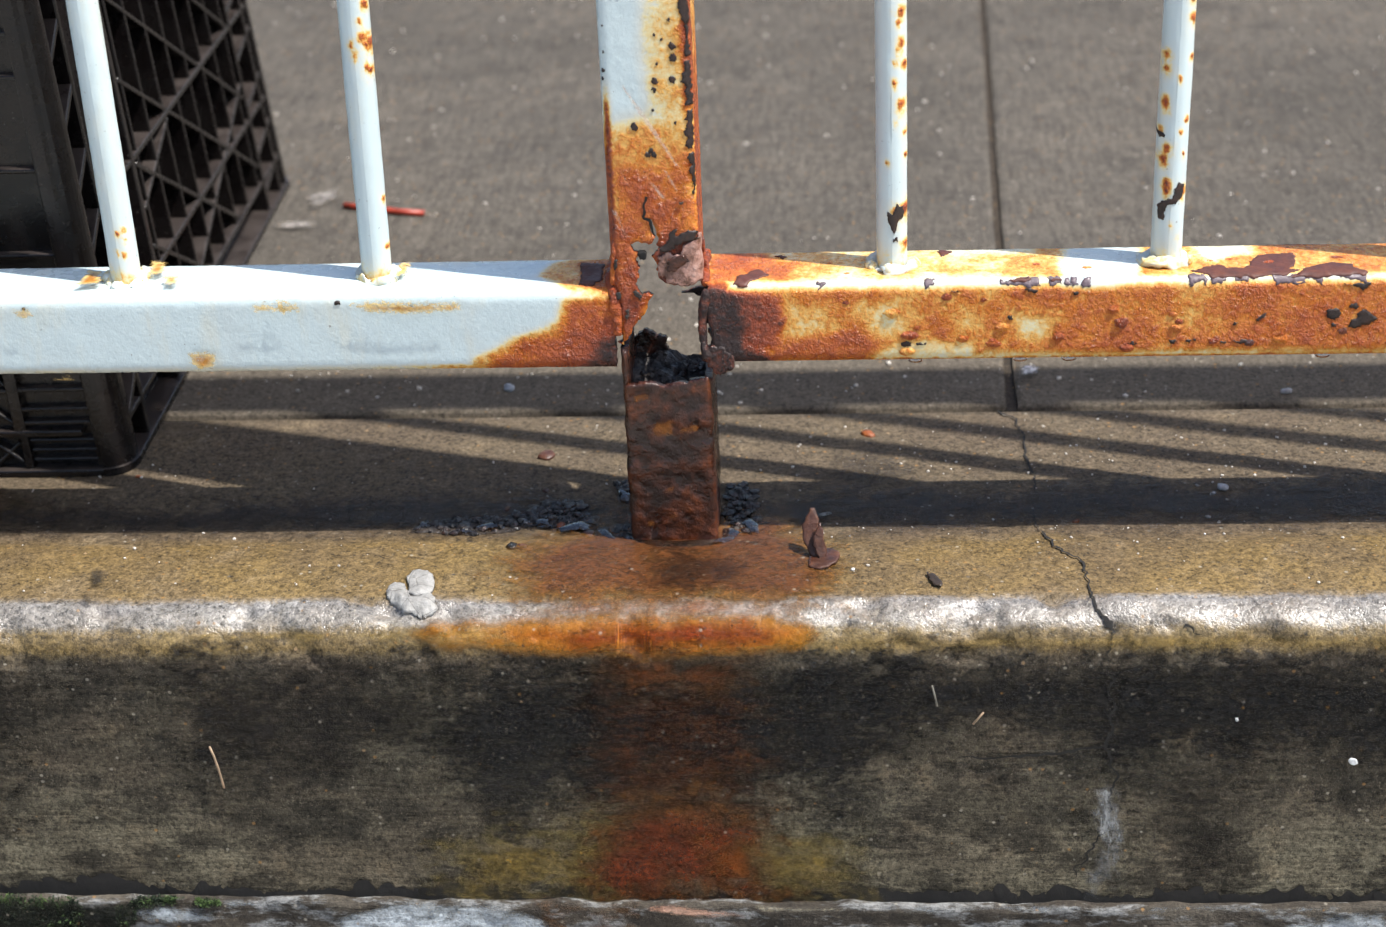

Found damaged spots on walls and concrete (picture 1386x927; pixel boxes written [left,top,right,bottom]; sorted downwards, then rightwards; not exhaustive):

peeling [658,232,704,287]
peeling [1005,277,1079,295]
peeling [1191,244,1378,328]
corrosion [882,308,921,356]
corrosion [985,308,1021,347]
corrosion [1108,305,1134,352]
corrosion [654,421,697,435]
crack [0,410,1386,904]
corrosion [418,507,859,927]
water stain [152,632,1386,891]